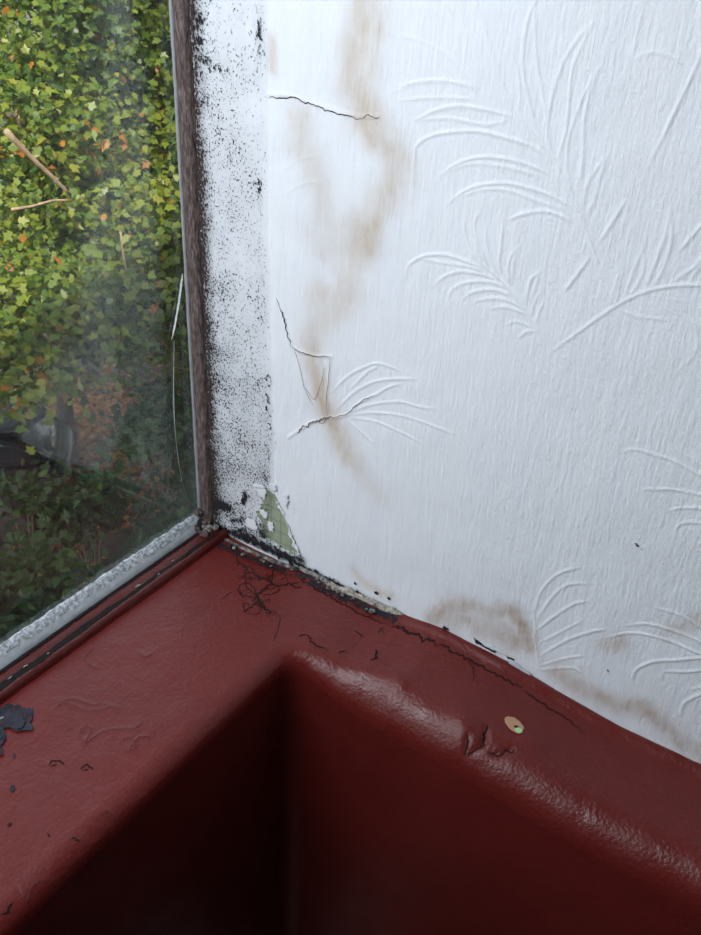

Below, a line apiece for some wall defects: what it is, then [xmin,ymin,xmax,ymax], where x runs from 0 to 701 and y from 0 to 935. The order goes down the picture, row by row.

crack [269,96,379,120]
leakage [188,0,274,555]
crack [276,298,330,412]
spalling [0,483,403,690]
crack [223,557,583,732]
spalling [474,638,531,676]
peeling [0,703,33,758]